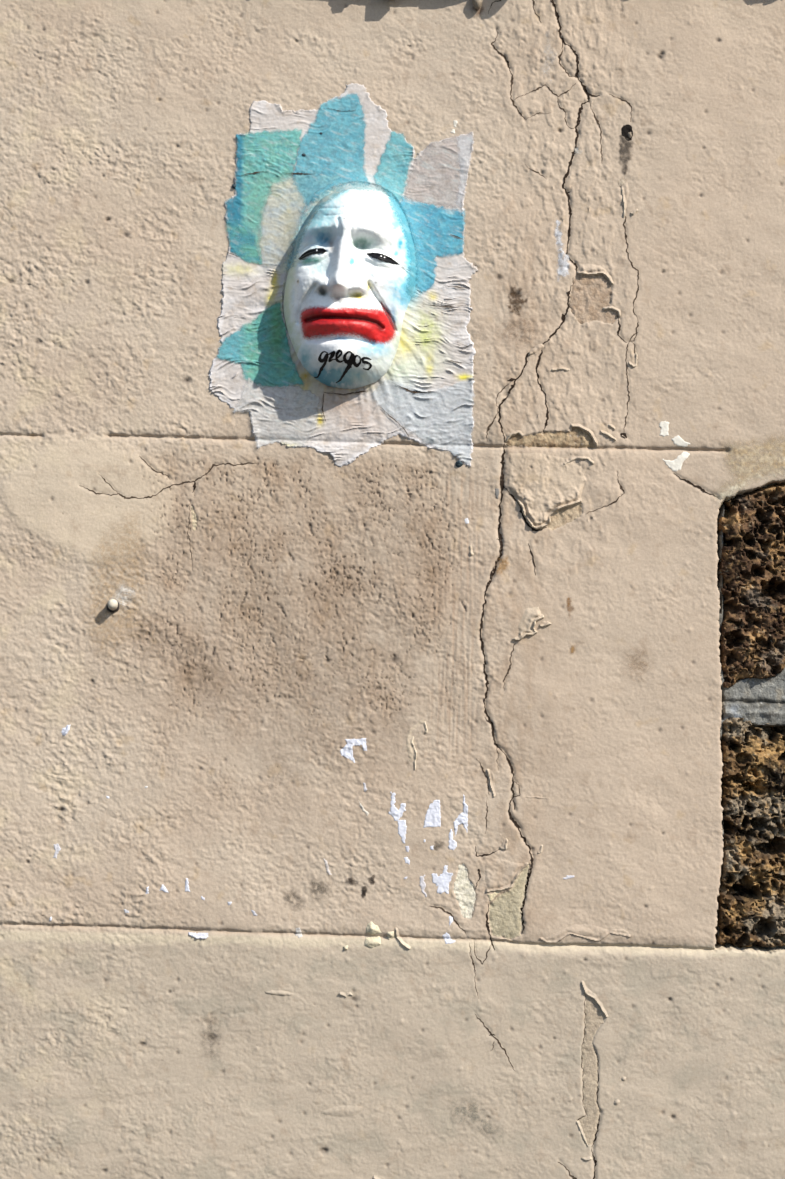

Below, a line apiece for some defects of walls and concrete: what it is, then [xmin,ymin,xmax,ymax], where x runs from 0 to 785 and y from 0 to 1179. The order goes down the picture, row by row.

crack [617,183,639,438]
crack [79,458,254,570]
crack [431,0,632,1071]
peeling [505,423,616,530]
spalling [453,833,543,939]
crack [558,998,600,1179]